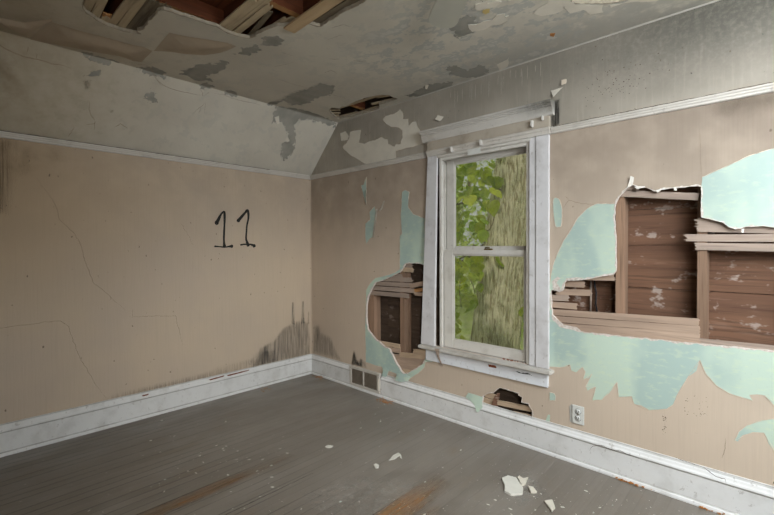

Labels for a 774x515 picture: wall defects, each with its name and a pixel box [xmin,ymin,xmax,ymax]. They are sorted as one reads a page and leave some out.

peeling [267,83,423,164]
spalling [365,190,443,379]
spalling [549,149,774,411]
spalling [482,387,533,417]
peeling [735,418,774,450]